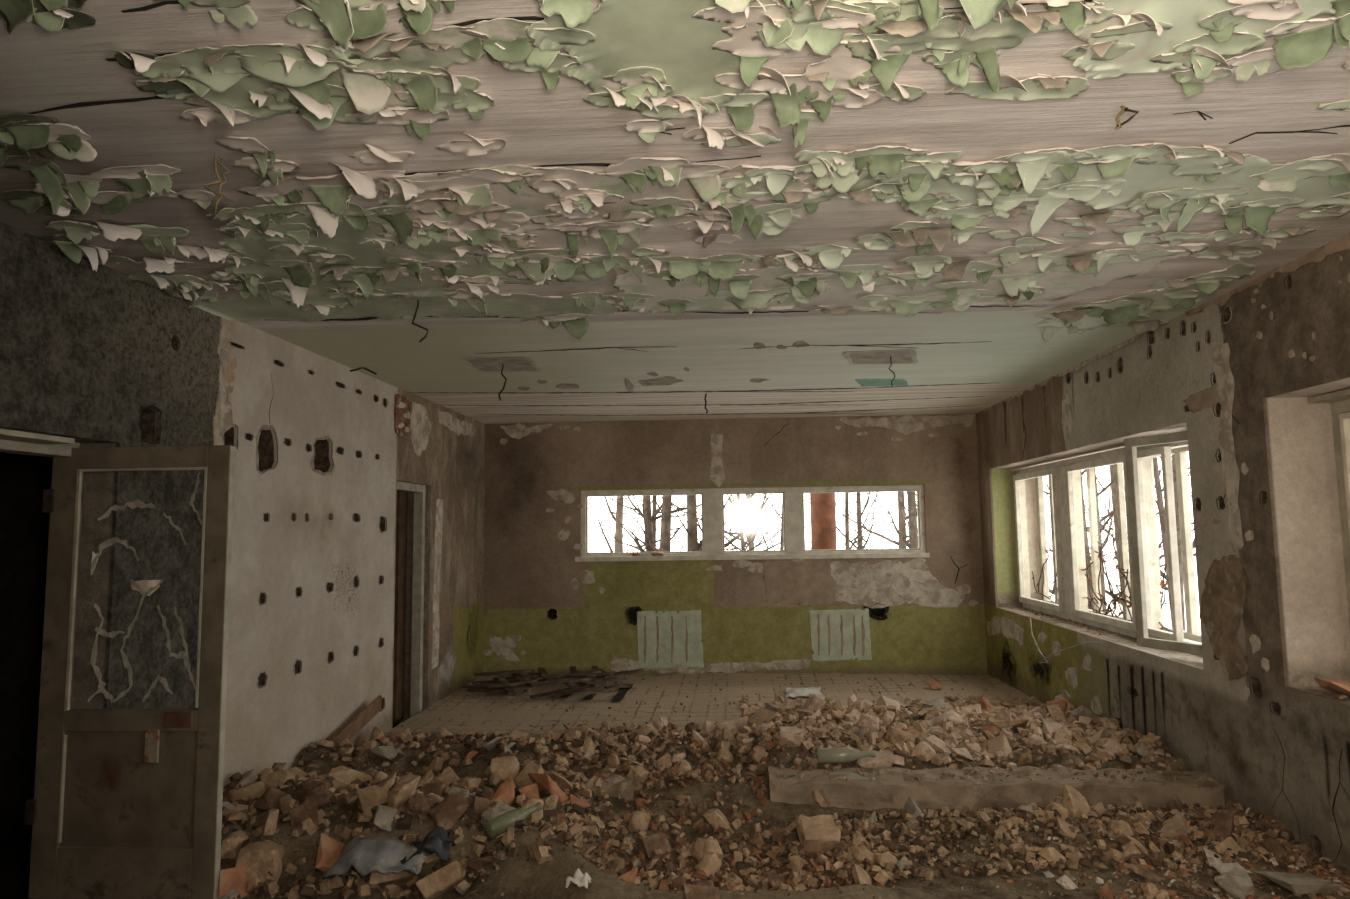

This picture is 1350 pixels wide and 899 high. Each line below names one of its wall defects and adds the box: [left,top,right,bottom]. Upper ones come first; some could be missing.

spalling [218,616,1123,899]
spalling [1018,784,1288,889]
spalling [1140,883,1169,899]